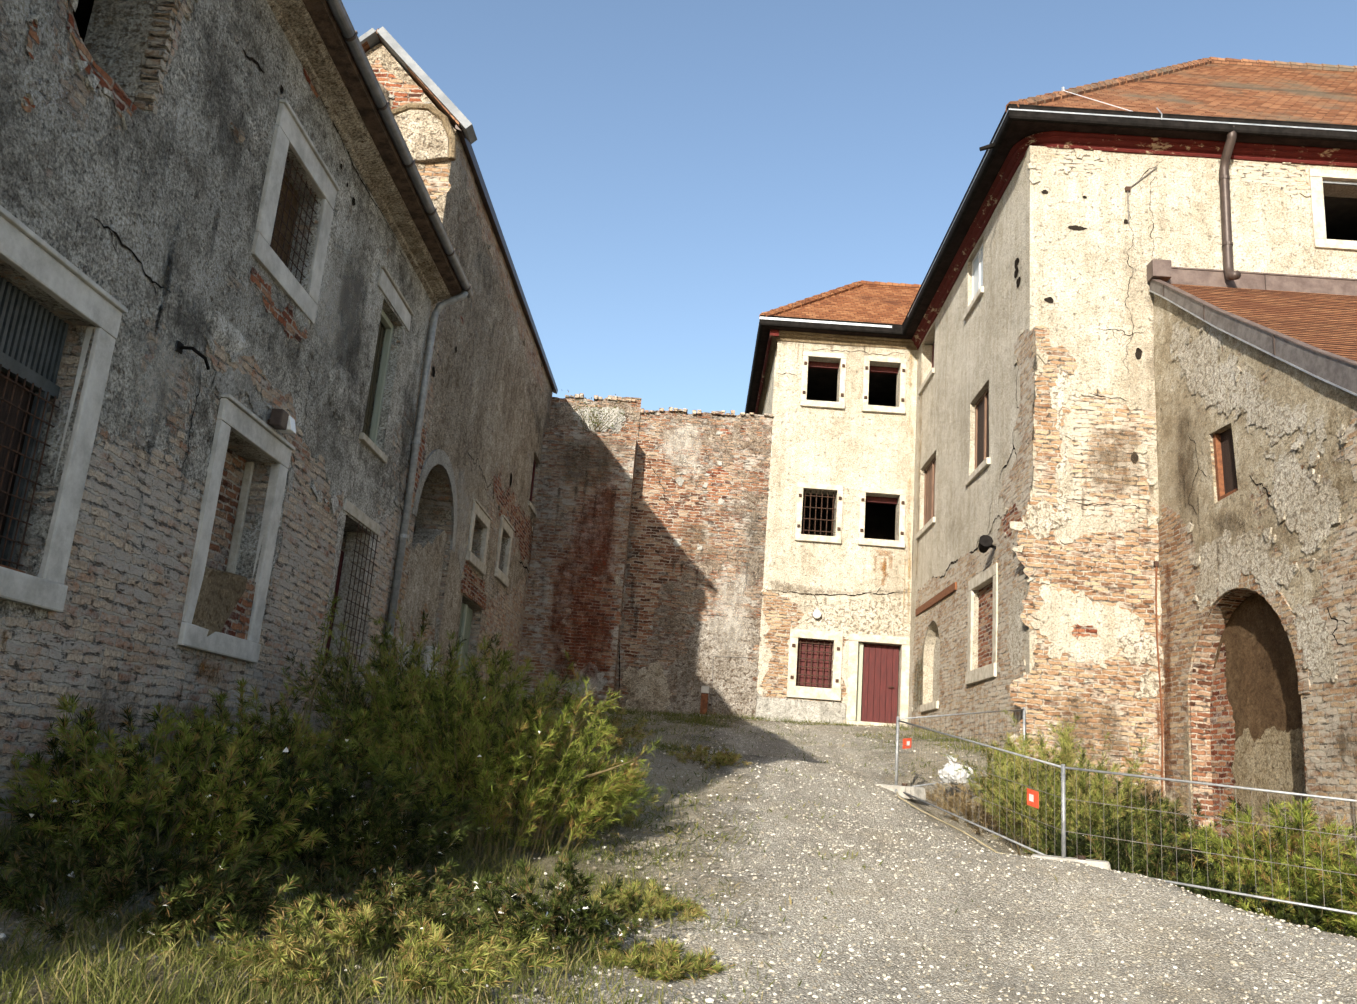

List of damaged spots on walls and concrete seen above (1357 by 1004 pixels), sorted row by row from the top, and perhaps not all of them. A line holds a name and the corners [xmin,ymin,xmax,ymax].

flaking render [67,11,137,129]
crack [94,218,171,302]
spalling [249,267,308,344]
crack [1075,159,1166,401]
flaking render [0,331,343,827]
damp [549,441,616,682]
flaking render [755,588,847,705]
flaking render [910,325,1201,803]
flaking render [1210,643,1245,847]
peeling [1290,440,1320,483]
flaking render [1287,508,1357,847]
flaking render [1337,412,1357,481]